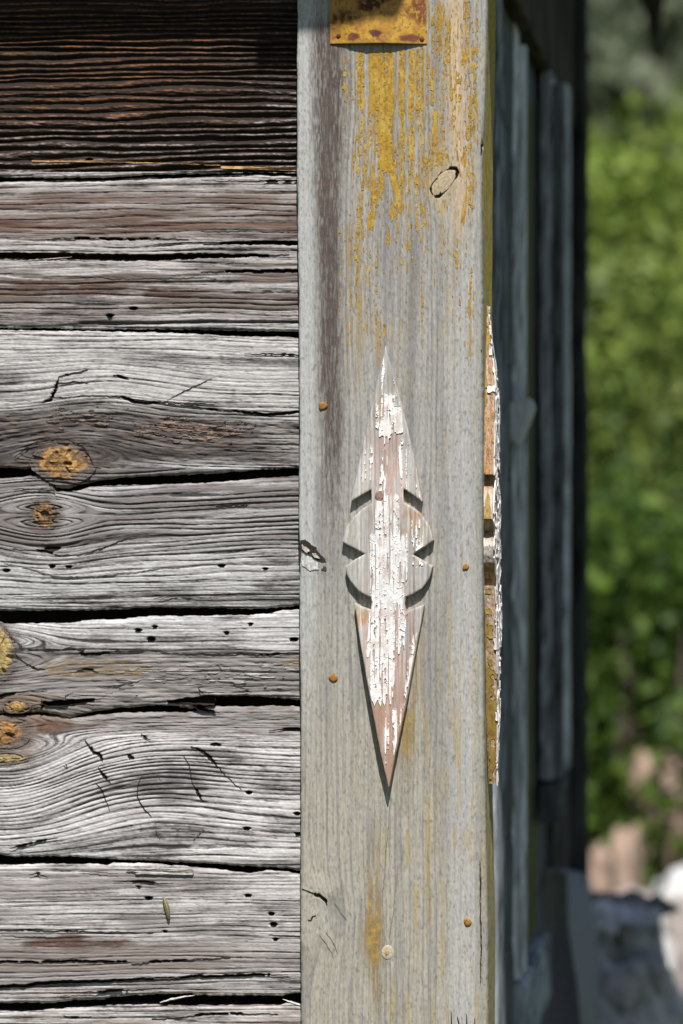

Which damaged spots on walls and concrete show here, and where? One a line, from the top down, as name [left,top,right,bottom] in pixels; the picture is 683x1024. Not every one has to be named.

corrosion [333,0,385,23]
corrosion [348,30,381,40]
corrosion [400,0,426,41]
crack [41,369,300,416]
peeling [338,1,502,786]
spalling [300,540,327,571]
crack [84,734,161,838]
crack [184,743,242,802]